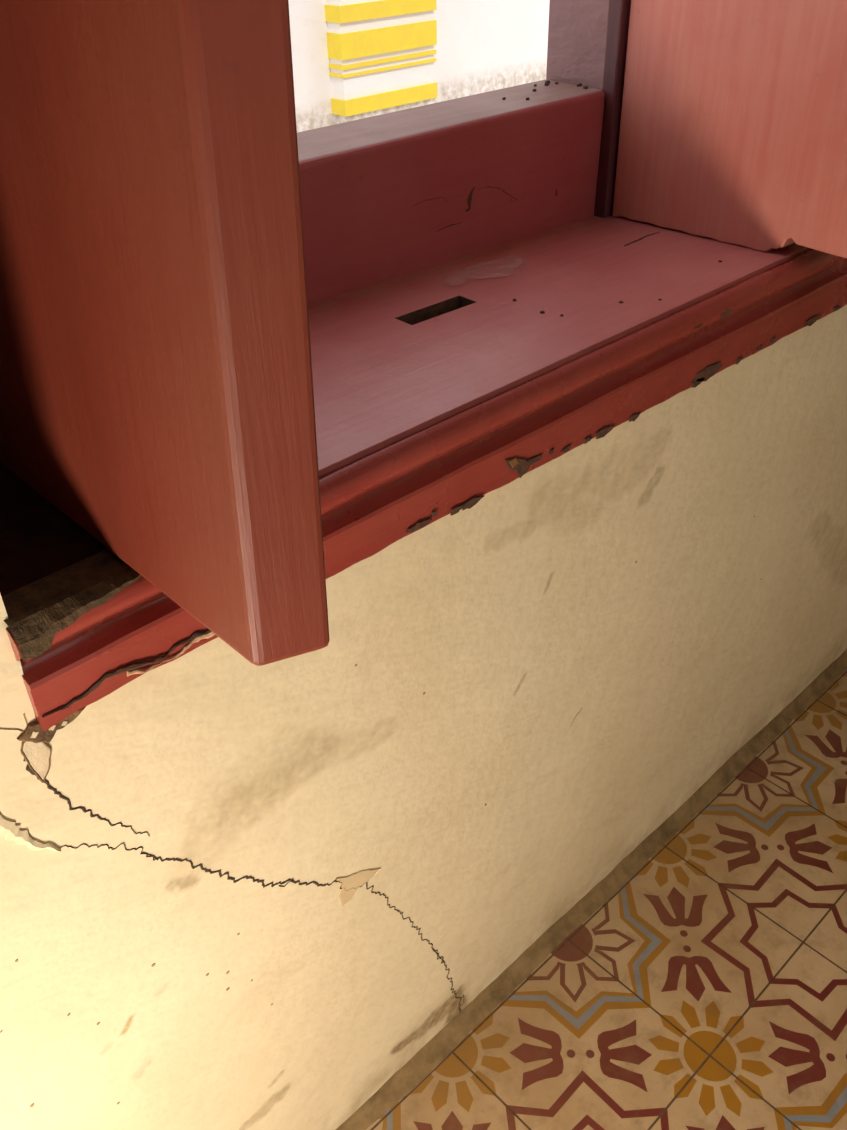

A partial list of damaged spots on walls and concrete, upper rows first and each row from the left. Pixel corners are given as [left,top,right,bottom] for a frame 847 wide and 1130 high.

crack [414,186,514,232]
peeling [691,362,721,388]
peeling [505,425,615,478]
peeling [406,495,484,533]
crack [1,629,215,732]
crack [23,759,464,1014]
peeling [335,868,381,907]